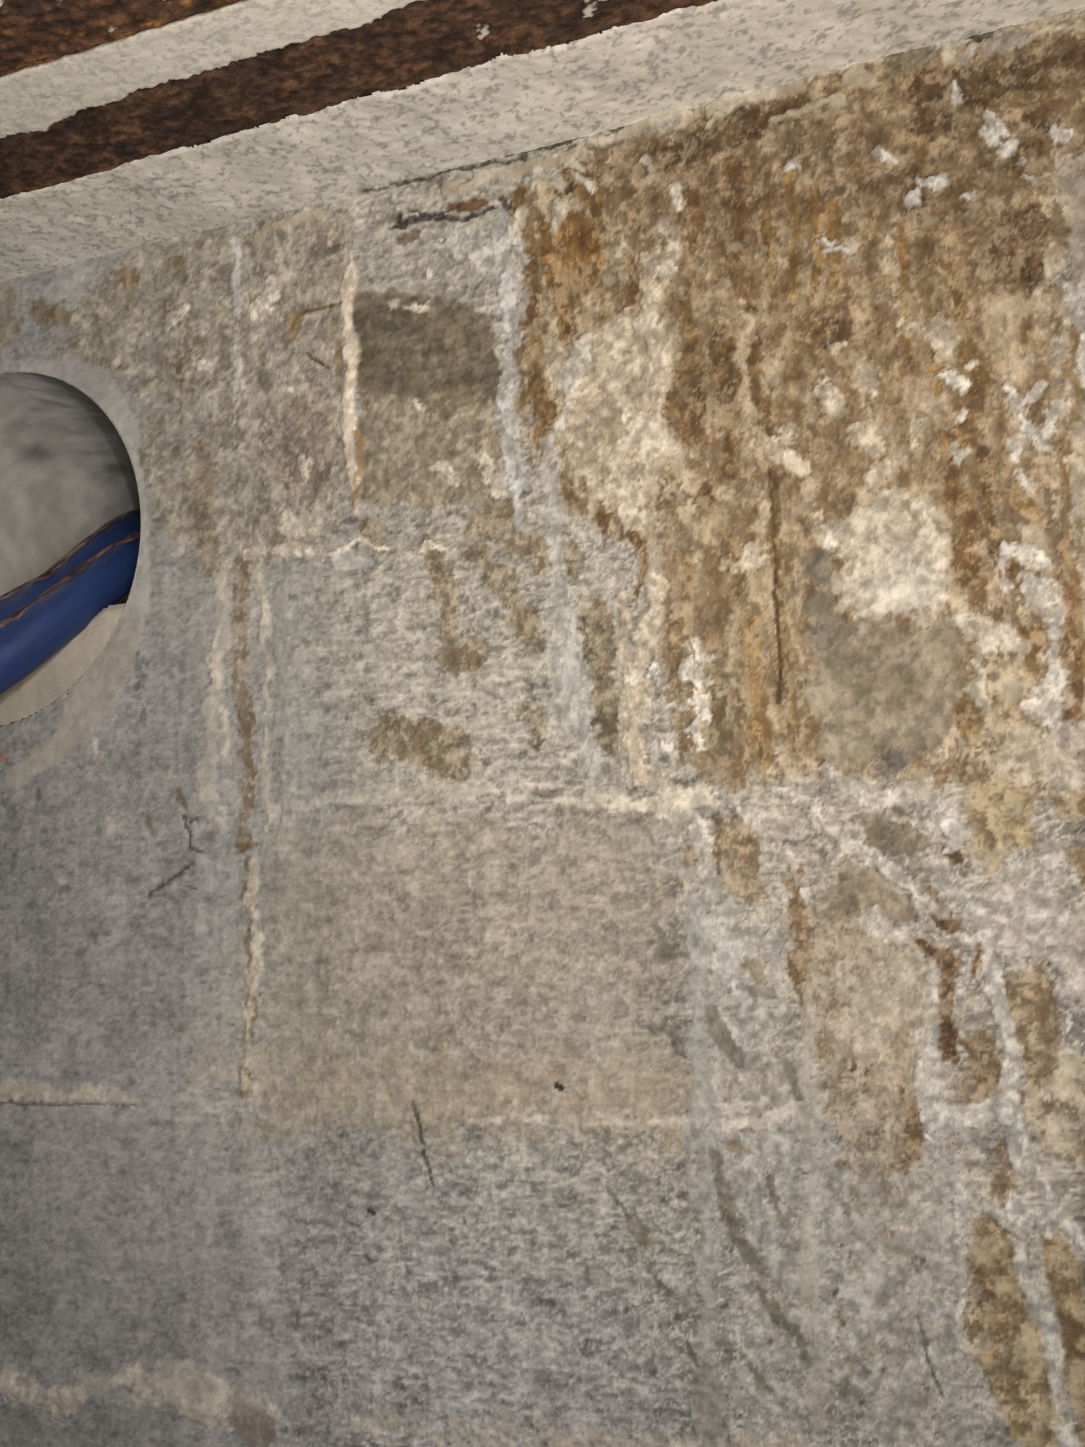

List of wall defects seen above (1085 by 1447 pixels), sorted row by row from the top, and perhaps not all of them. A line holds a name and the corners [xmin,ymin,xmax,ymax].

peeling [0,0,428,138]
peeling [474,23,492,41]
peeling [580,0,608,19]
damp [946,76,965,110]
spalling [876,21,1085,79]
damp [545,158,600,237]
damp [814,234,855,256]
damp [869,143,981,212]
damp [976,108,1085,204]
spalling [1055,184,1085,282]
damp [0,180,812,904]
damp [181,239,1085,1447]